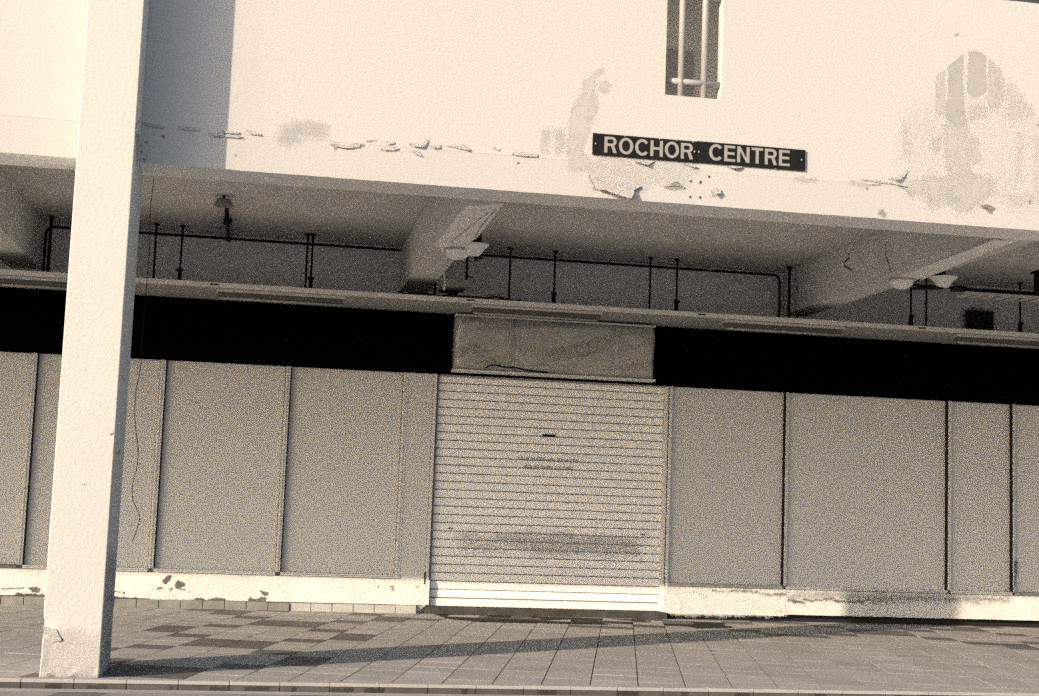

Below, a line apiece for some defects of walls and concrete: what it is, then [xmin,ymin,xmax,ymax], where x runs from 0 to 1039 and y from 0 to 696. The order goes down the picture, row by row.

peeling [179,117,471,156]
peeling [587,155,699,200]
spalling [1,587,45,596]
peeling [115,575,225,601]